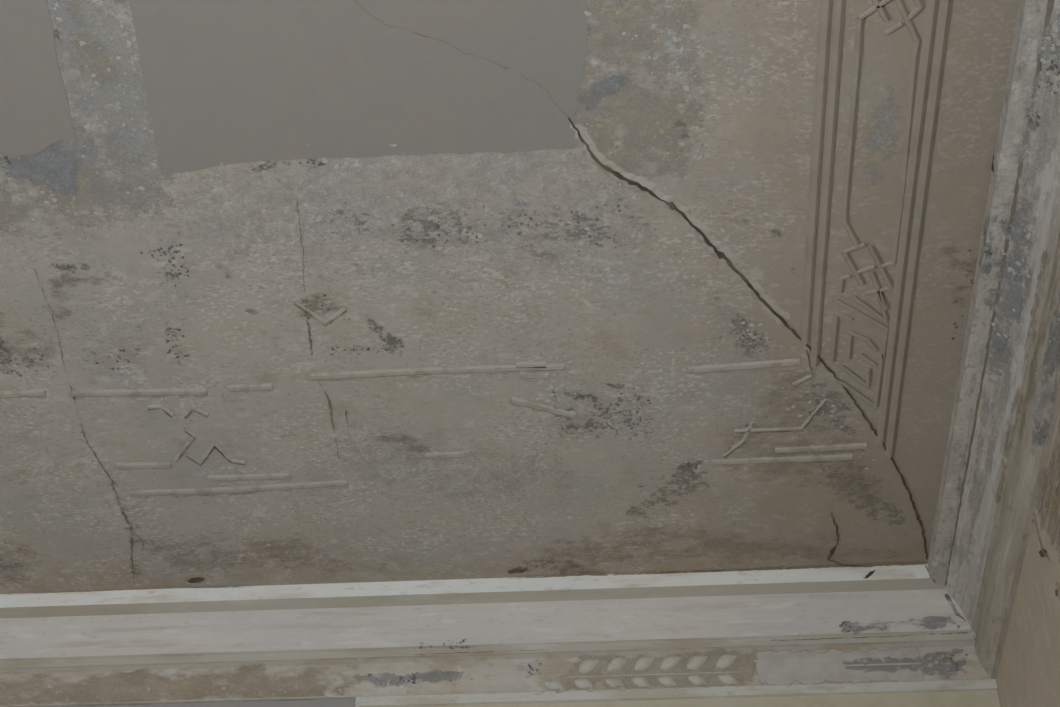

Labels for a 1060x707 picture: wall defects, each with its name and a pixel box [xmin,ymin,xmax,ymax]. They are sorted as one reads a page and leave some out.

crack [354,0,975,639]
leakage [996,253,1056,502]
crack [8,431,234,595]
crack [772,635,867,643]